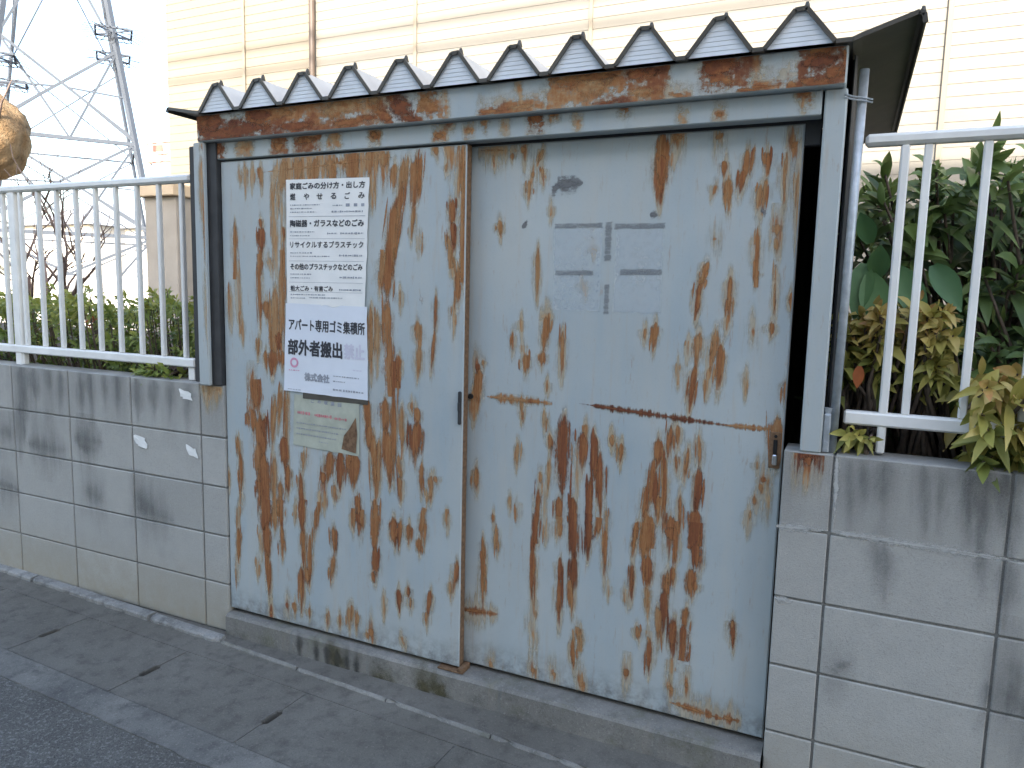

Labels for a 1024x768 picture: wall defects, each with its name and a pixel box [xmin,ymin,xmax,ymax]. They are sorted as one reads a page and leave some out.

rust [197,46,847,692]
rust [623,262,741,730]